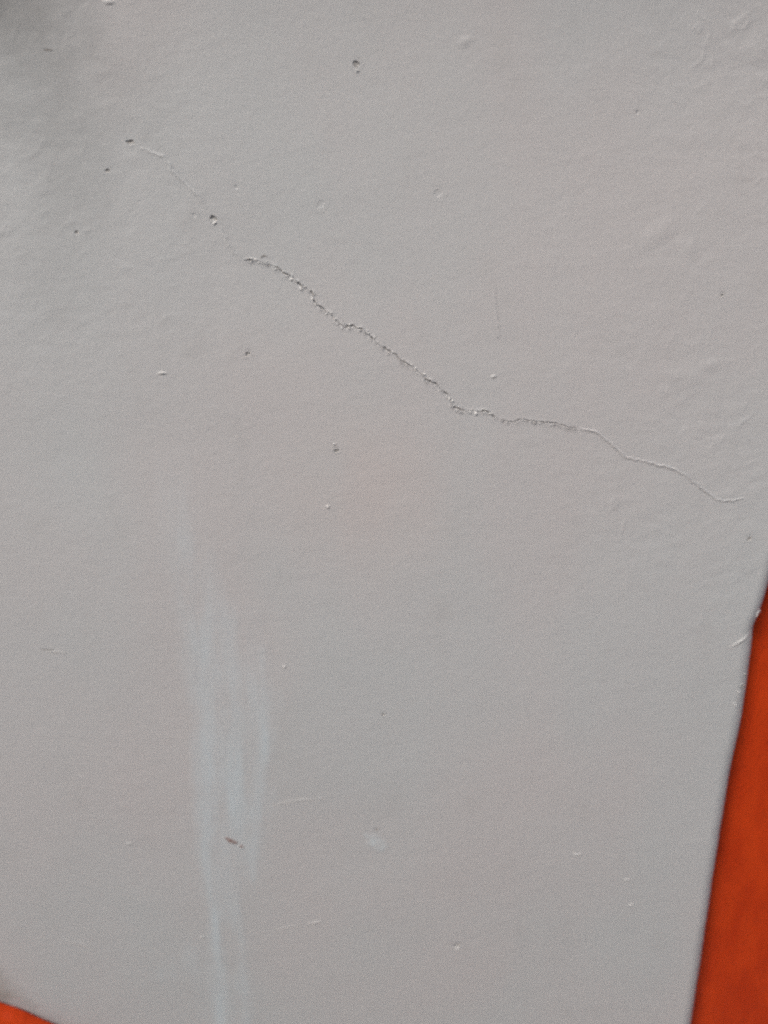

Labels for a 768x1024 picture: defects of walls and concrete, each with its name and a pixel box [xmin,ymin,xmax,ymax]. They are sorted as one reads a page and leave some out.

crack [135,145,747,503]